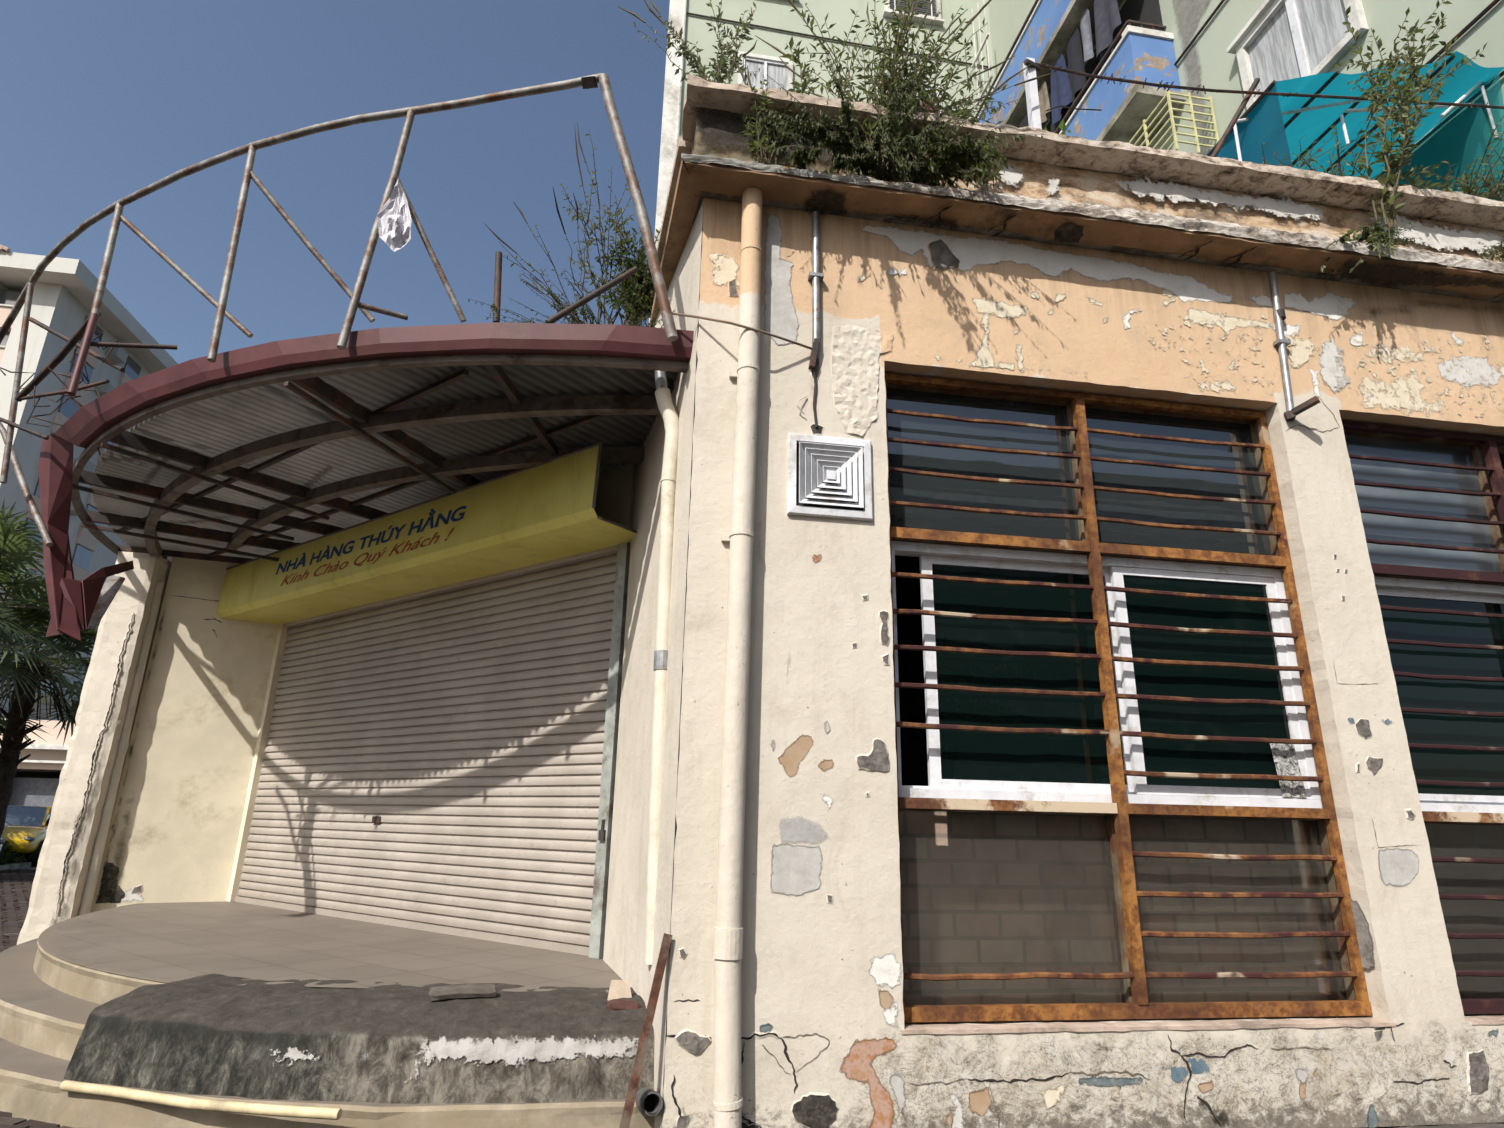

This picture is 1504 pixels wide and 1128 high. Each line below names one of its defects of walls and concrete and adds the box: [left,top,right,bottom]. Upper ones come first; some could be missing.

peeling [997,166,1023,188]
peeling [1115,176,1322,221]
peeling [1370,214,1504,255]
peeling [857,223,1504,417]
flaking render [855,738,890,773]
flaking render [1347,718,1392,775]
crack [671,1076,690,1128]
crack [666,999,830,1094]
crack [741,1113,771,1128]
peeling [839,952,906,1128]
crack [909,1035,1332,1128]
crack [1393,1060,1456,1084]